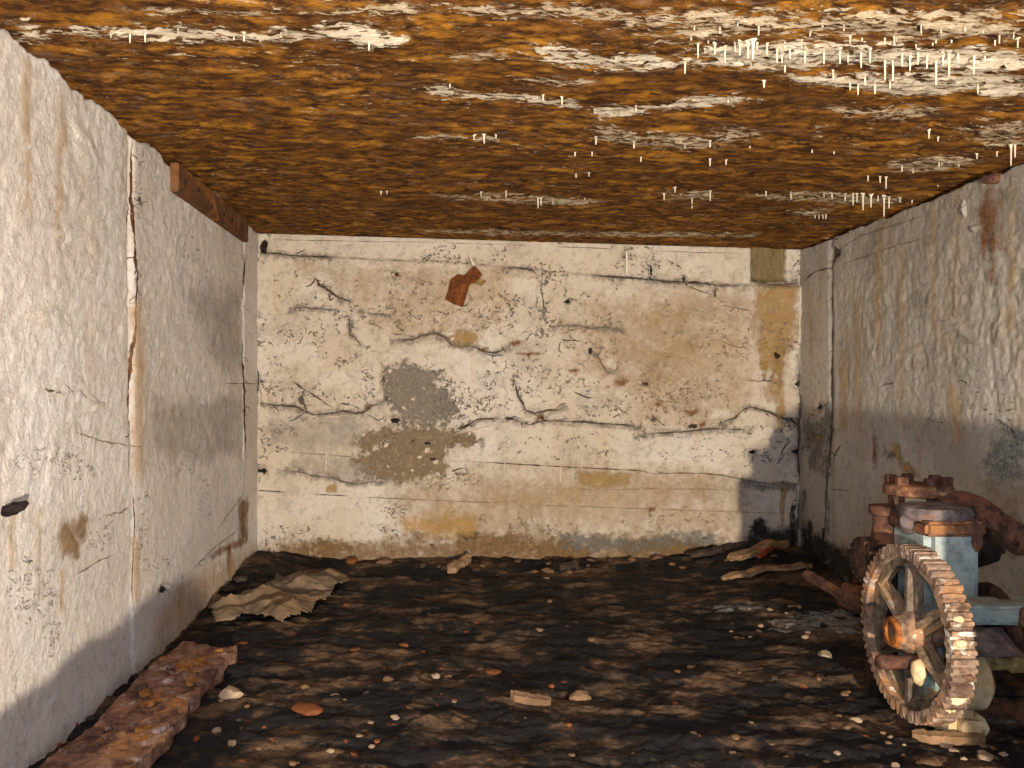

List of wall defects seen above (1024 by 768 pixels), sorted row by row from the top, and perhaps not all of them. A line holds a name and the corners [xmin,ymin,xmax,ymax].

efflorescence [7,0,1024,152]
efflorescence [429,191,605,207]
efflorescence [746,190,902,218]
efflorescence [878,120,1024,174]
rust [980,190,1003,284]
crack [79,141,140,604]
crack [242,250,510,356]
spalling [257,242,825,491]
water stain [419,228,799,428]
crack [448,247,854,544]
rust [212,502,244,574]
water stain [275,512,714,561]